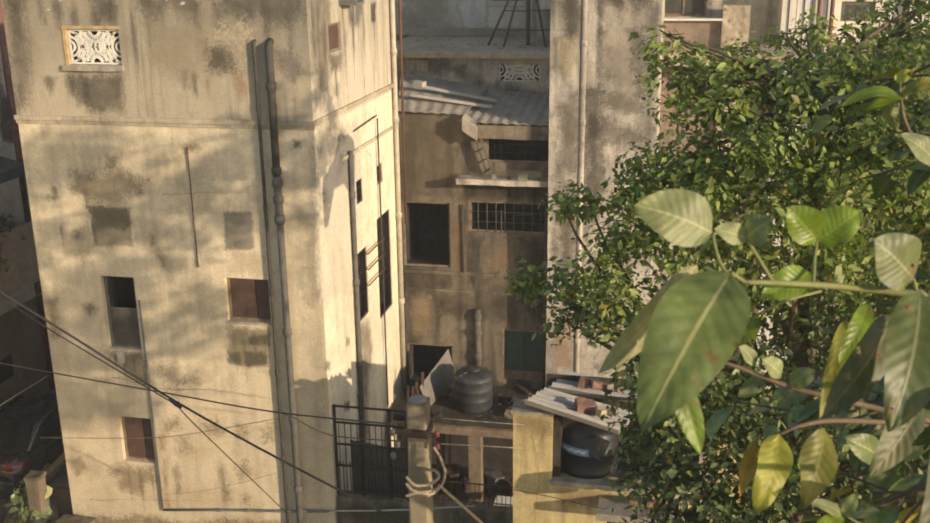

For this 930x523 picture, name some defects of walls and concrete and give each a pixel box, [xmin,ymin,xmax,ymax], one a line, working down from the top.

damp [206,48,232,73]
damp [214,0,340,88]
damp [551,0,583,61]
damp [69,74,121,112]
damp [558,0,659,202]
damp [72,158,150,235]
damp [464,185,548,200]
damp [516,209,586,319]
damp [228,326,270,366]